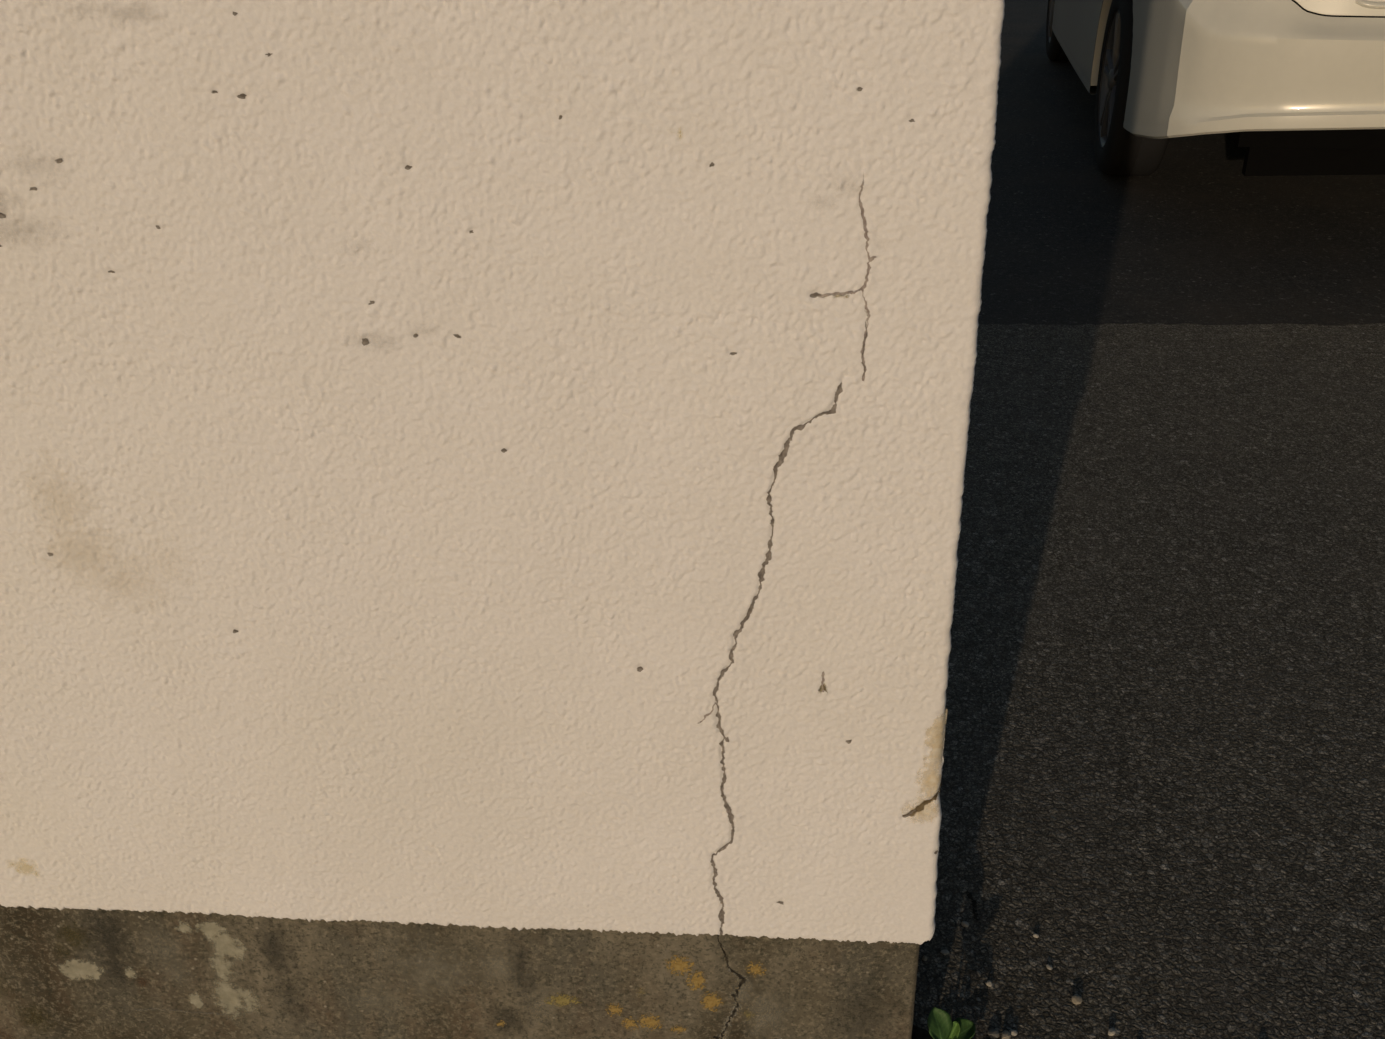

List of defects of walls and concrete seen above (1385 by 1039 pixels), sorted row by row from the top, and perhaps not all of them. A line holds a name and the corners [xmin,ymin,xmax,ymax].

crack [700,175,876,1039]
crack [902,791,939,818]